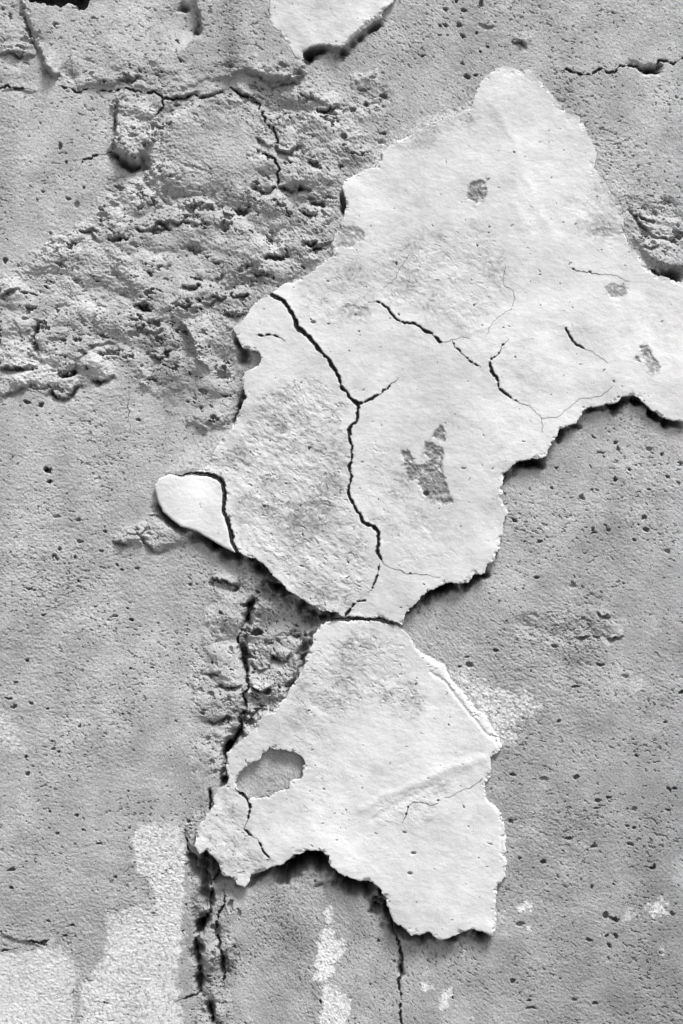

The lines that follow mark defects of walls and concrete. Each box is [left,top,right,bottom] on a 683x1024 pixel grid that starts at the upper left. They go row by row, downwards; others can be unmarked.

crack [0,84,297,235]
crack [559,58,683,75]
flaking render [0,0,683,625]
crack [374,255,609,425]
crack [178,472,238,552]
crack [258,294,433,626]
crack [209,603,269,858]
flaking render [184,565,507,1024]
crack [175,828,226,1022]